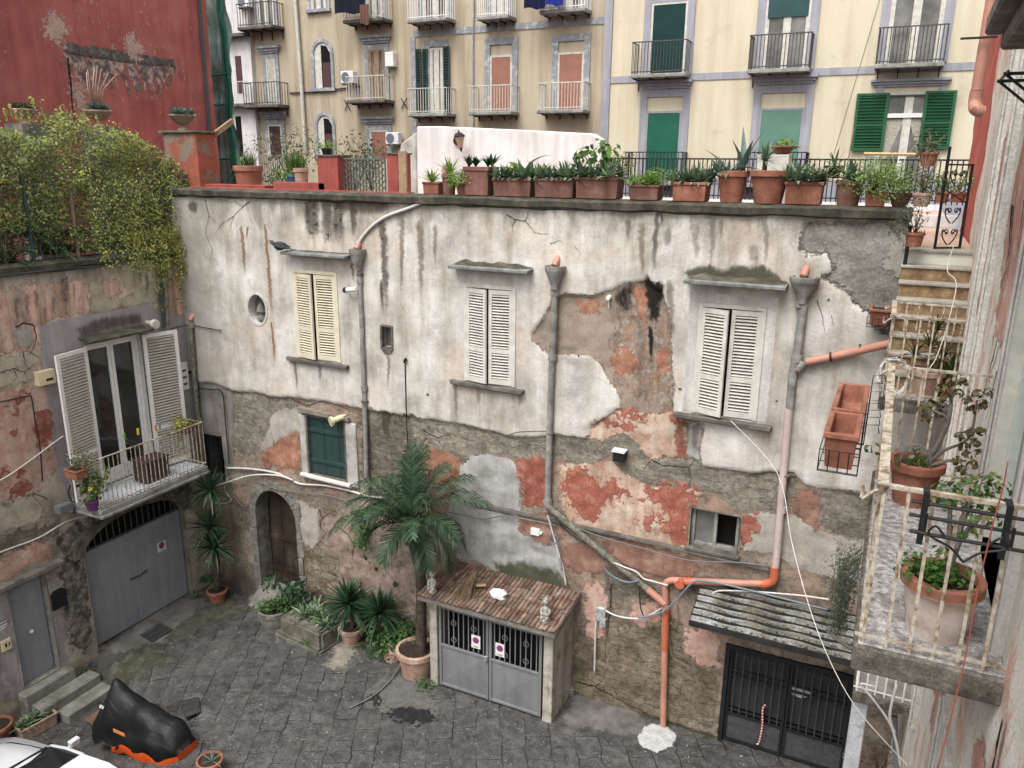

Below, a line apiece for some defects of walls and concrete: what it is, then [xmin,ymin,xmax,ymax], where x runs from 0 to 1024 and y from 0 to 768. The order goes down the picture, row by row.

peeling [39,8,183,118]
crack [205,200,250,270]
damp [305,201,386,235]
damp [380,224,388,300]
damp [653,212,662,254]
flaking render [798,219,907,338]
crack [1,322,40,380]
peeling [0,275,184,655]
flaking render [232,392,301,478]
flaking render [357,282,868,738]